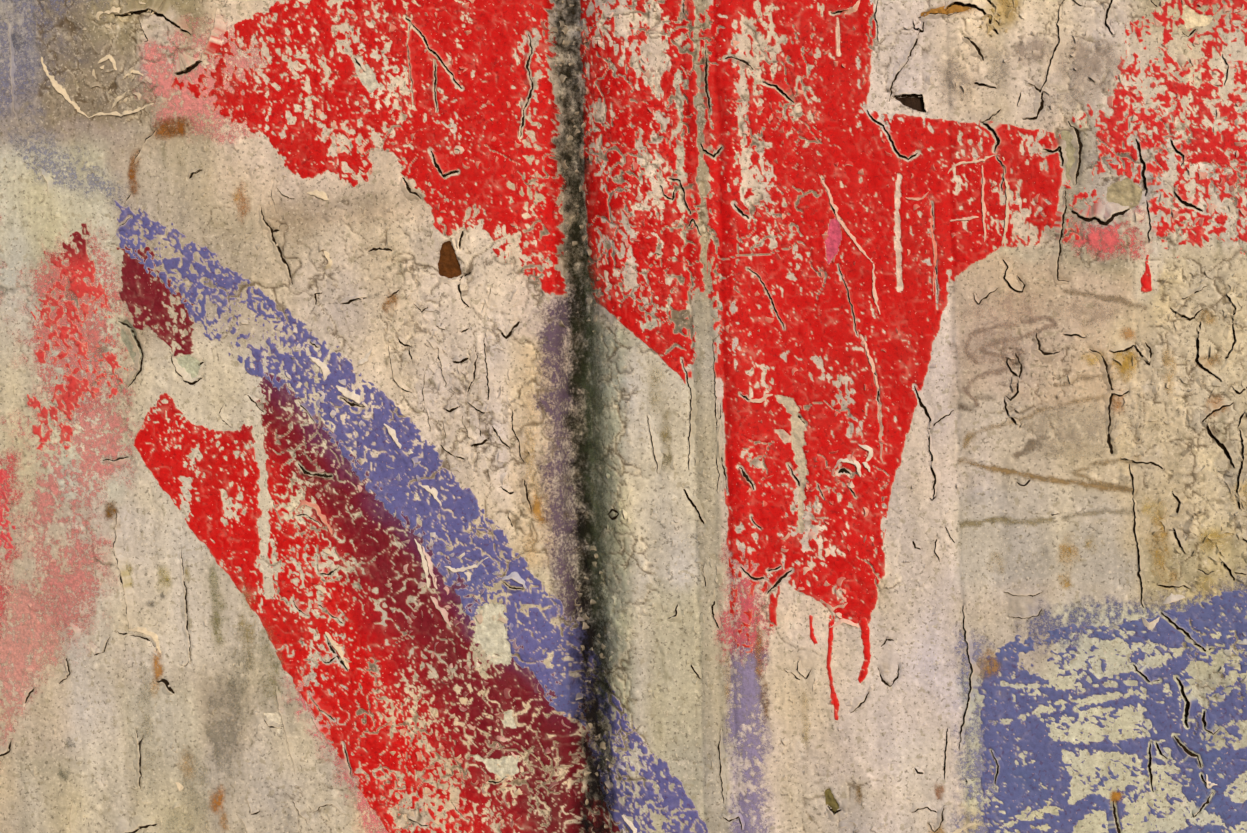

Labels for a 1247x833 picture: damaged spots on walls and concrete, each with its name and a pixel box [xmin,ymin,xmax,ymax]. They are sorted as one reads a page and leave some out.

peeling [41,54,154,118]
crack [831,0,921,160]
peeling [893,75,933,112]
peeling [903,0,1041,63]
crack [905,0,1157,301]
crack [1136,138,1205,243]
peeling [271,322,370,440]
peeling [382,231,553,542]
leakage [553,0,615,833]
crack [1064,328,1114,454]
peeling [1107,271,1247,595]
crack [1132,498,1211,652]